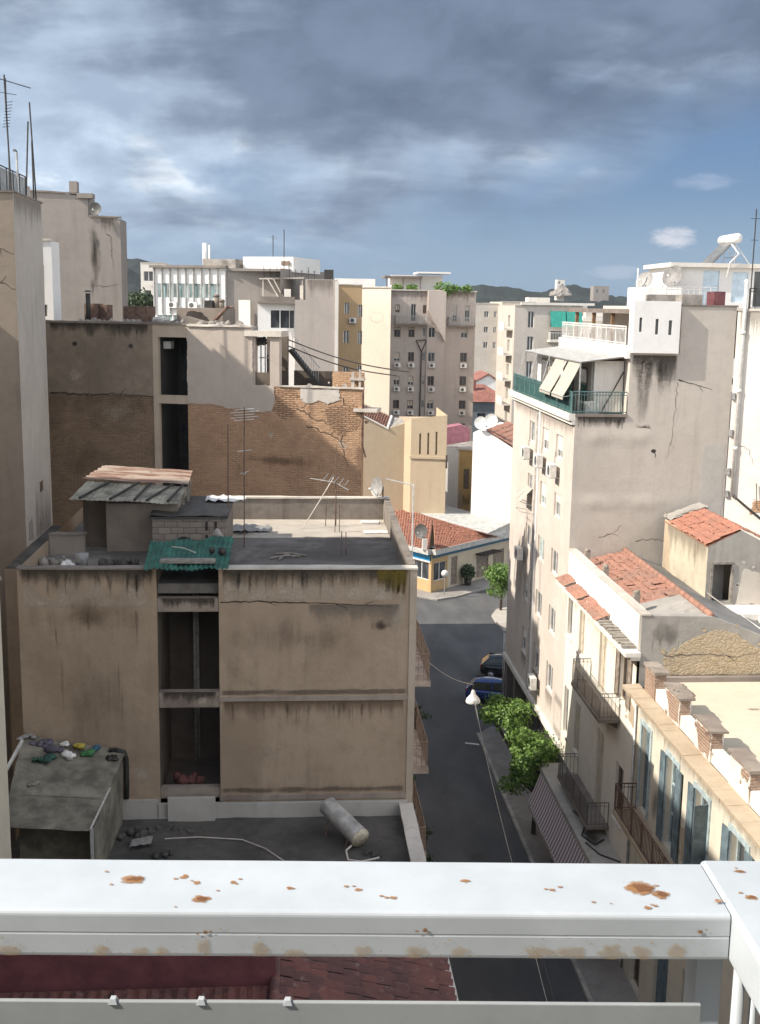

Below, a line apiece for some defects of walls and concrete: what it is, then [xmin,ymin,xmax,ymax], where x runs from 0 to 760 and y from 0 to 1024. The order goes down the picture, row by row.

leakage [633,355,677,379]
spalling [273,383,312,421]
crack [297,398,348,467]
spalling [321,403,369,436]
crack [652,379,712,459]
leakage [21,570,152,605]
leakage [162,570,401,607]
crack [220,600,391,611]
corrosion [104,871,144,885]
corrosion [173,874,219,902]
corrosion [625,882,670,909]